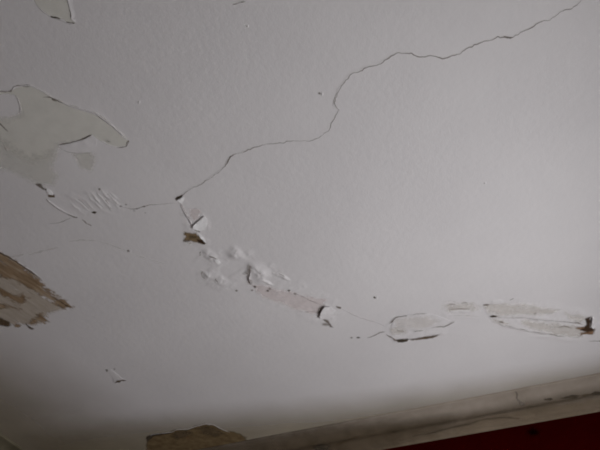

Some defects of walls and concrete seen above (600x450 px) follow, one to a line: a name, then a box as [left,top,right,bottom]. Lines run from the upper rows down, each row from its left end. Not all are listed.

peeling [34,0,77,26]
crack [311,2,580,141]
peeling [0,85,129,195]
crack [120,141,287,209]
flaking render [0,252,72,329]
peeling [251,274,347,327]
spalling [368,307,461,344]
peeling [478,297,600,344]
corrosion [575,316,596,335]